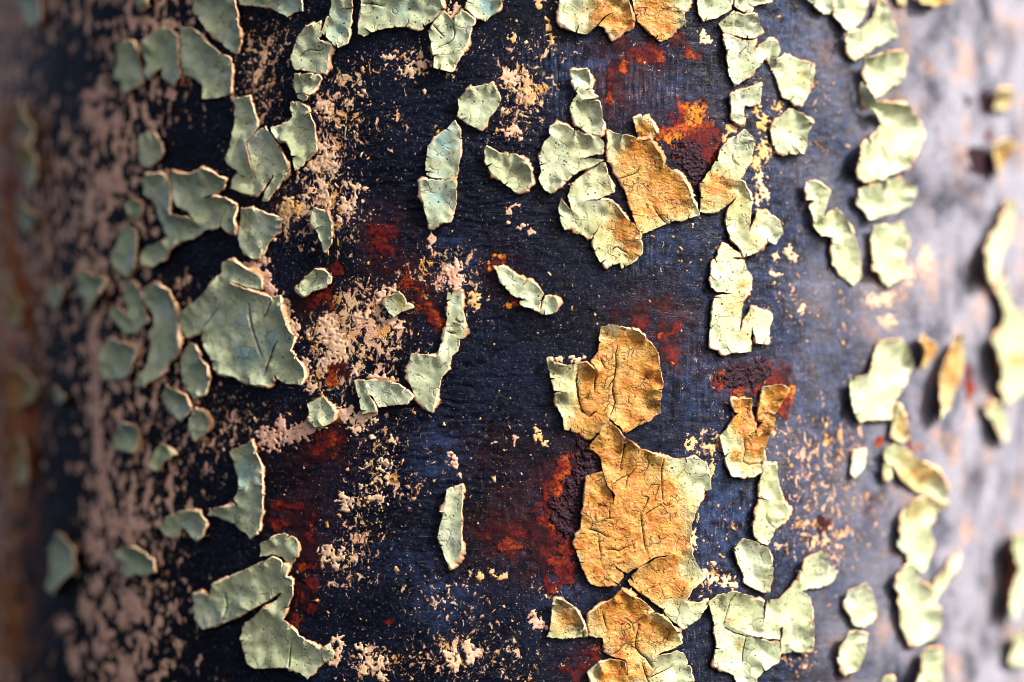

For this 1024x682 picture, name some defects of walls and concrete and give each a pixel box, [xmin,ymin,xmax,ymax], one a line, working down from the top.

peeling [49,0,504,443]
corrosion [360,220,446,331]
peeling [484,0,815,356]
corrosion [597,32,703,109]
corrosion [655,97,722,188]
peeling [803,0,953,287]
corrosion [712,355,796,421]
peeling [159,438,335,680]
corrosion [477,433,601,594]
crack [589,443,669,552]
peeling [546,324,838,682]
peeling [835,582,877,677]